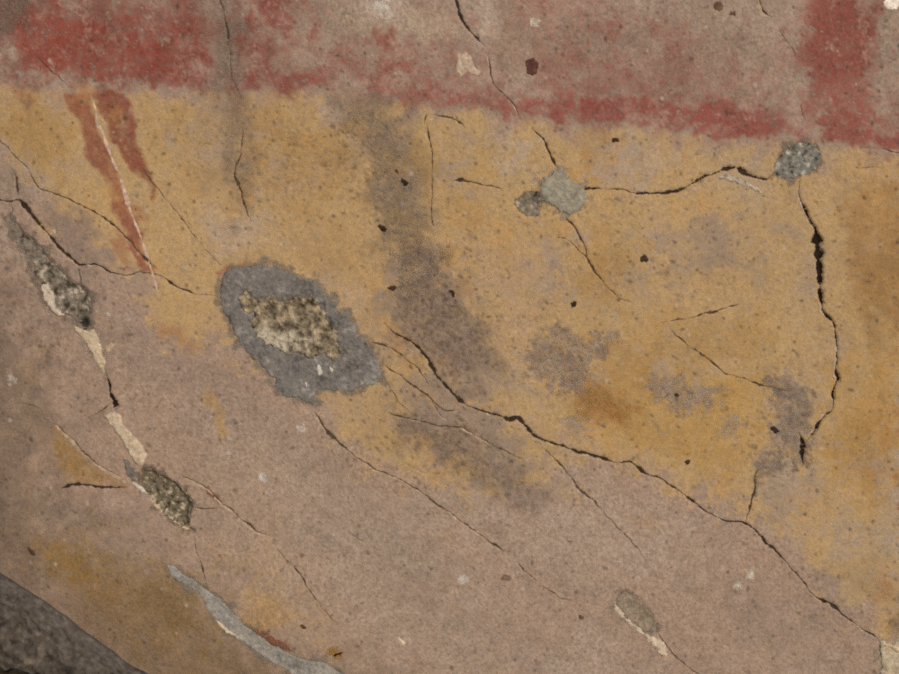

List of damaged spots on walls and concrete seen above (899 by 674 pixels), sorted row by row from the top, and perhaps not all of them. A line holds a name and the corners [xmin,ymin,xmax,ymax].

crack [455,0,557,167]
spalling [3,215,95,330]
crack [0,140,221,296]
spalling [514,191,541,217]
crack [585,166,774,195]
crack [799,183,839,465]
crack [94,372,119,415]
crack [54,425,127,489]
spalling [123,459,195,531]
crack [315,412,572,601]
crack [372,323,879,640]
spalling [614,590,667,656]